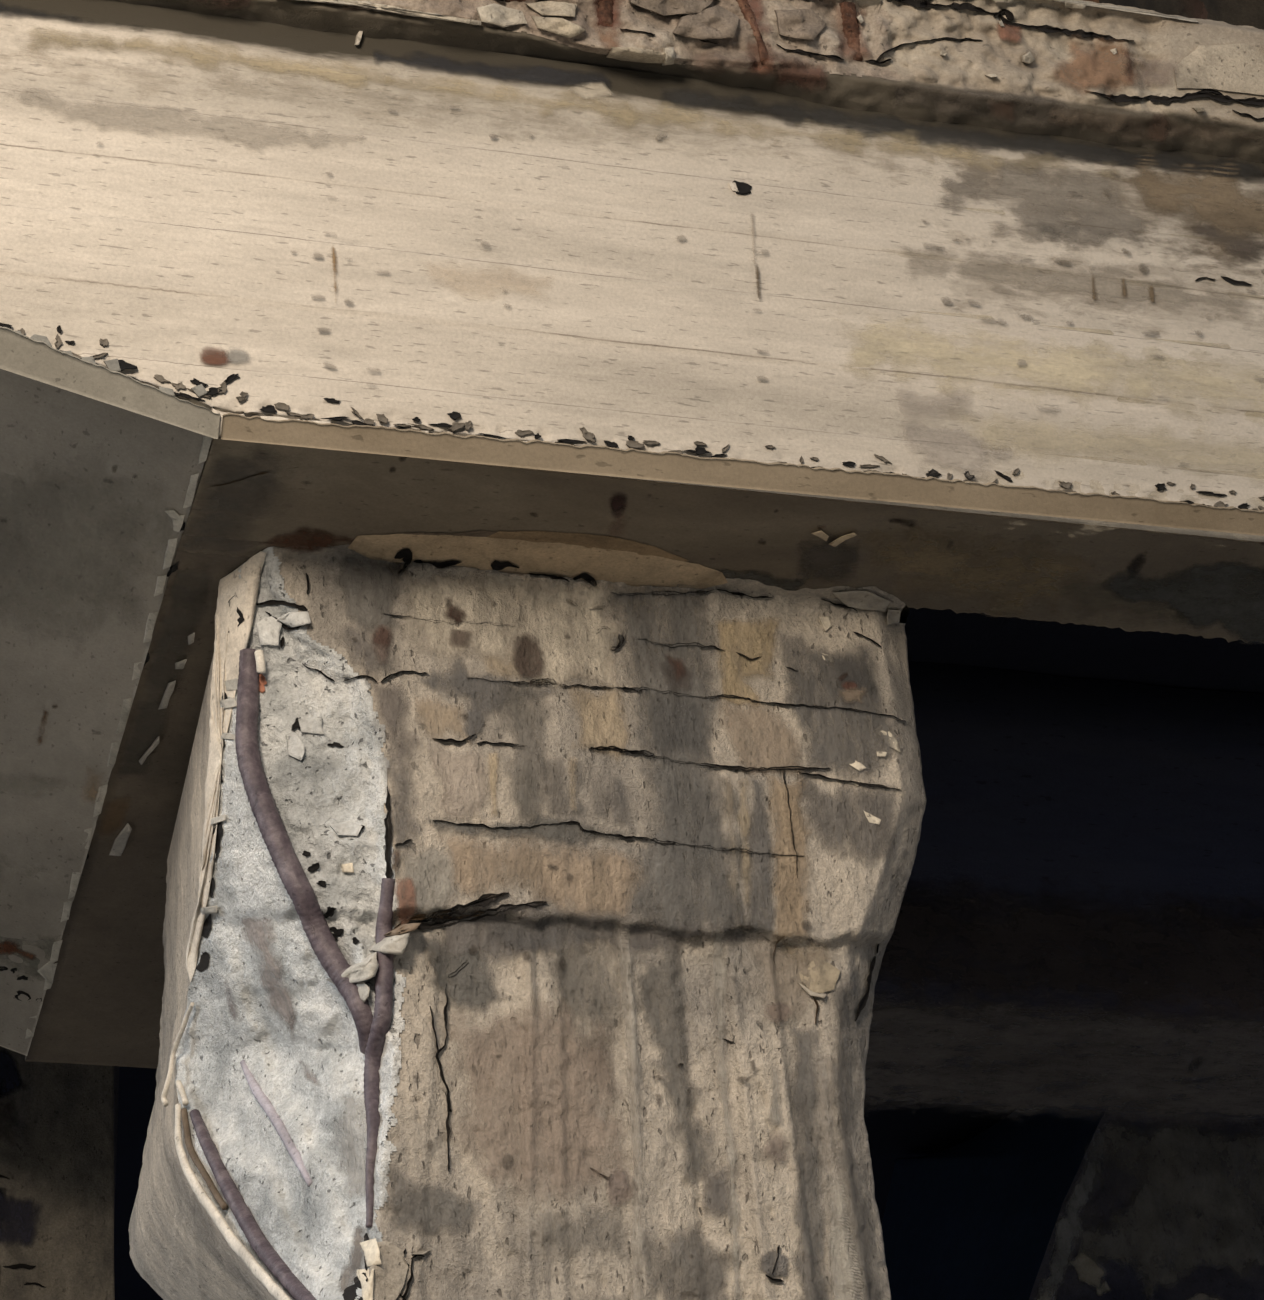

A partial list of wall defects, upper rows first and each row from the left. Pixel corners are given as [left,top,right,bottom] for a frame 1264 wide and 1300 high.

spalling [299,0,901,81]
rust [596,0,618,47]
rust [691,0,825,88]
crack [776,0,1134,65]
spalling [1174,43,1264,95]
leakage [23,34,1264,259]
leakage [870,529,1264,644]
spalling [176,547,430,1300]
crack [384,786,546,930]
leakage [339,557,893,1300]
crack [438,746,897,878]
crack [430,960,469,1172]